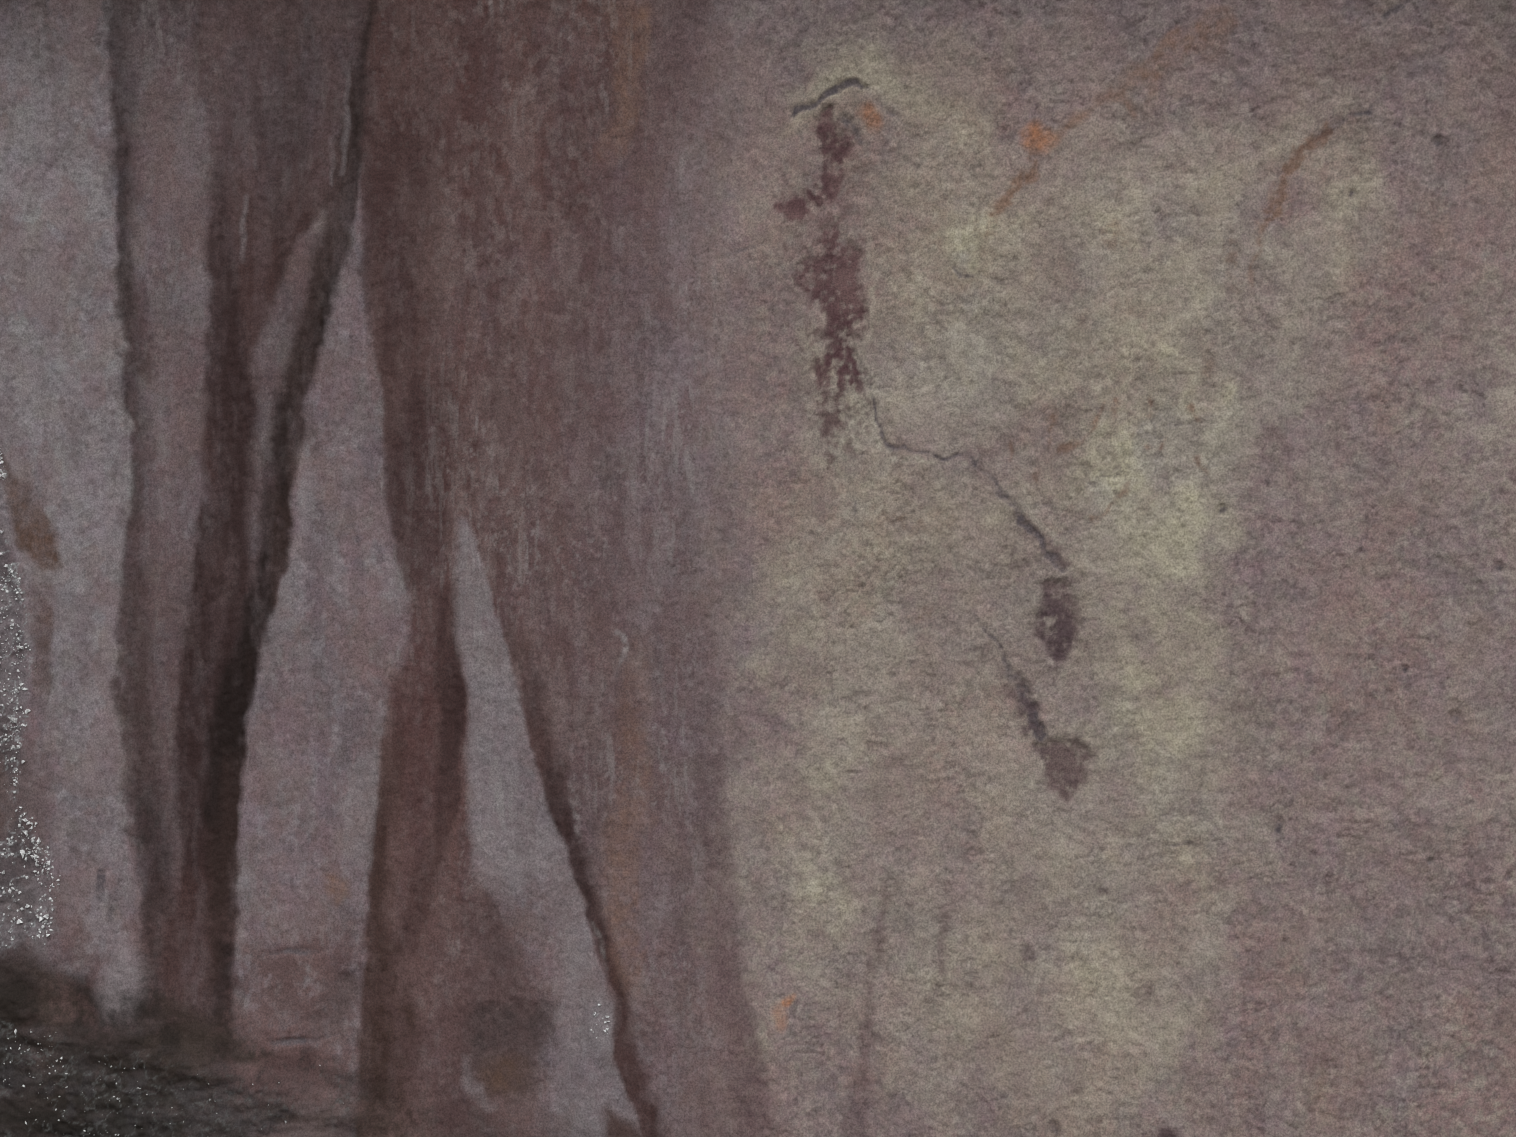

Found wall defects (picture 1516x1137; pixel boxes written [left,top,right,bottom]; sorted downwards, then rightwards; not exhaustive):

damp [0,0,788,1137]
crack [866,376,1081,572]
crack [943,257,1021,290]
damp [731,10,1516,1137]